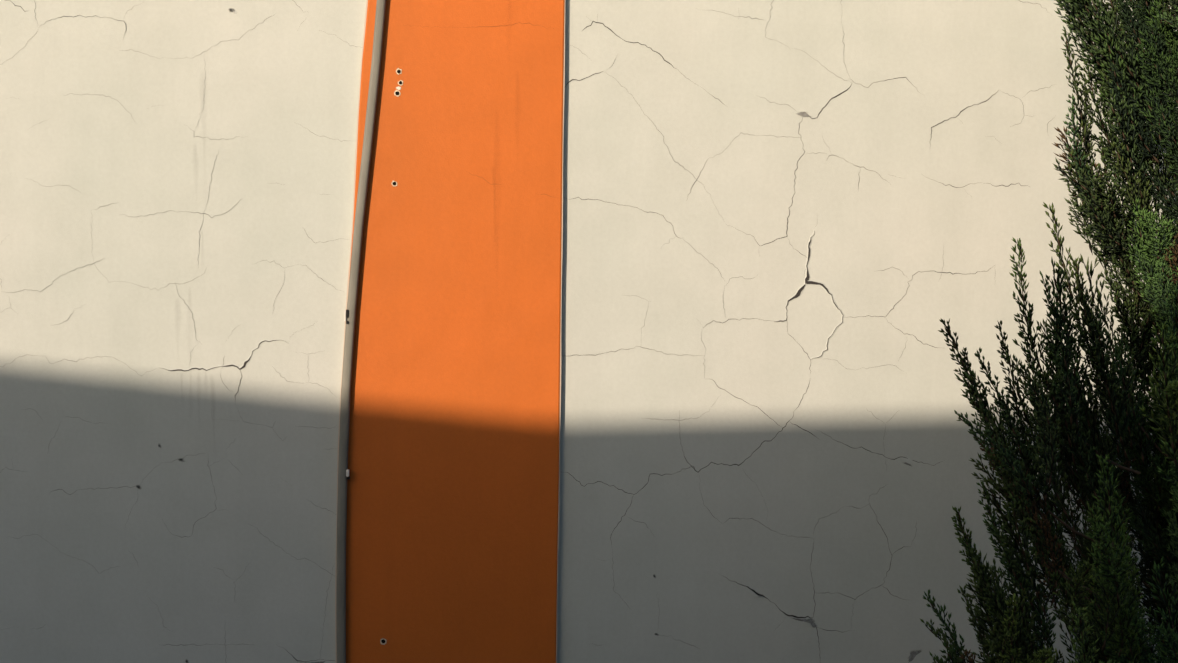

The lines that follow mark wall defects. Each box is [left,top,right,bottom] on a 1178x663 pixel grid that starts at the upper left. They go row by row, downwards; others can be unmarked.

crack [6,2,153,61]
crack [0,16,331,411]
crack [405,0,1030,649]
crack [930,86,1051,147]